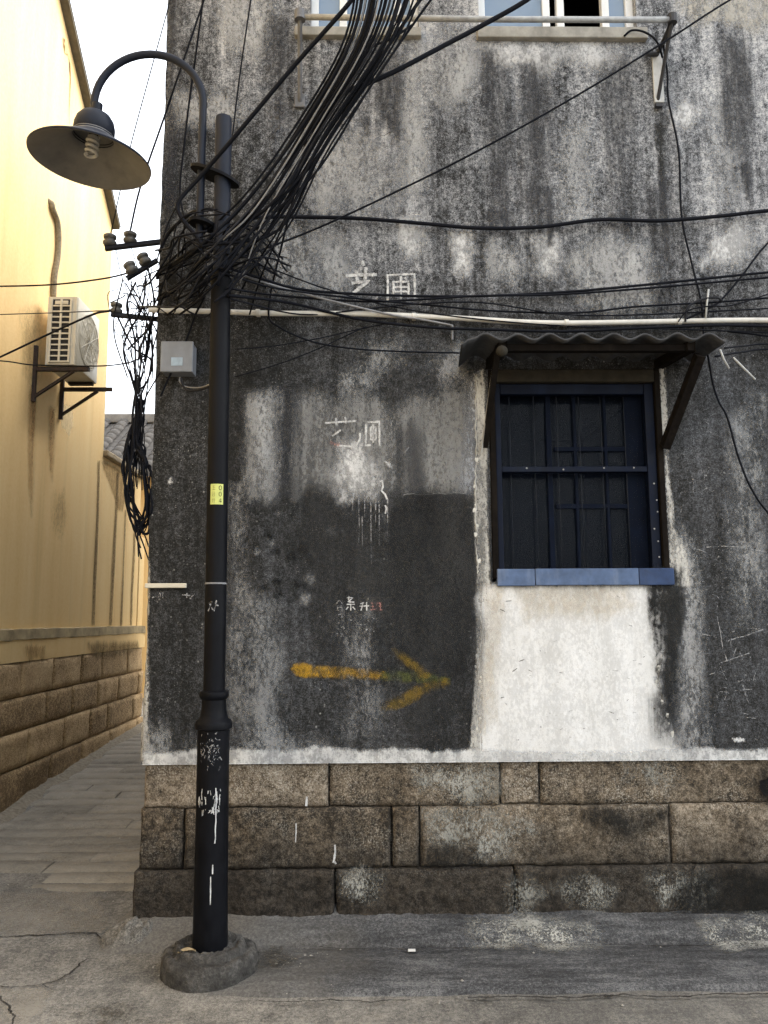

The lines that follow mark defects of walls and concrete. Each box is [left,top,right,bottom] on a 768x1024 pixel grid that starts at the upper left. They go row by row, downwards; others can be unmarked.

damp [312,31,508,233]
damp [525,63,591,244]
damp [682,0,768,200]
crack [0,932,101,1024]